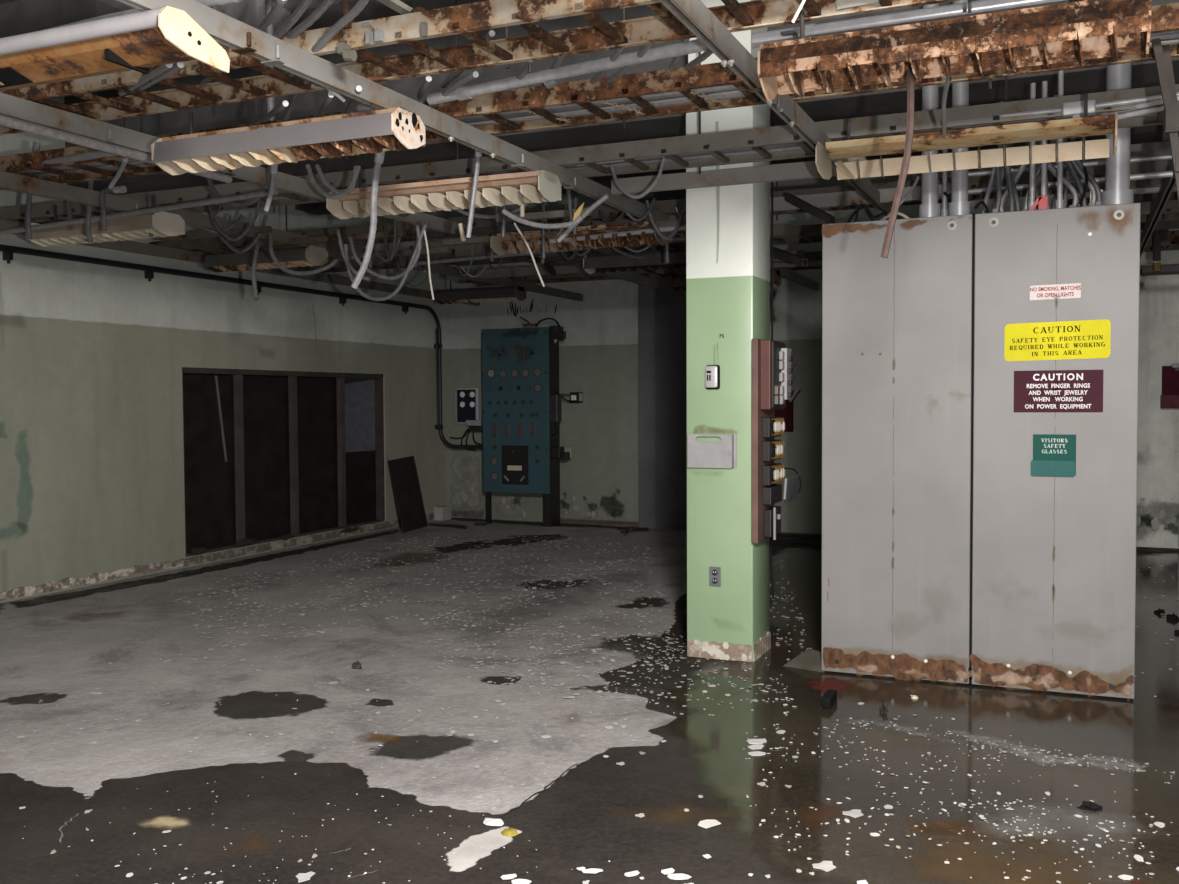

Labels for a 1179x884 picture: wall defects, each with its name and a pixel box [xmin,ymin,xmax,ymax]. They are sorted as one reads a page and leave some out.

damp [772,533,822,556]
damp [1136,547,1179,557]
flaking render [687,632,771,662]
damp [0,593,845,884]